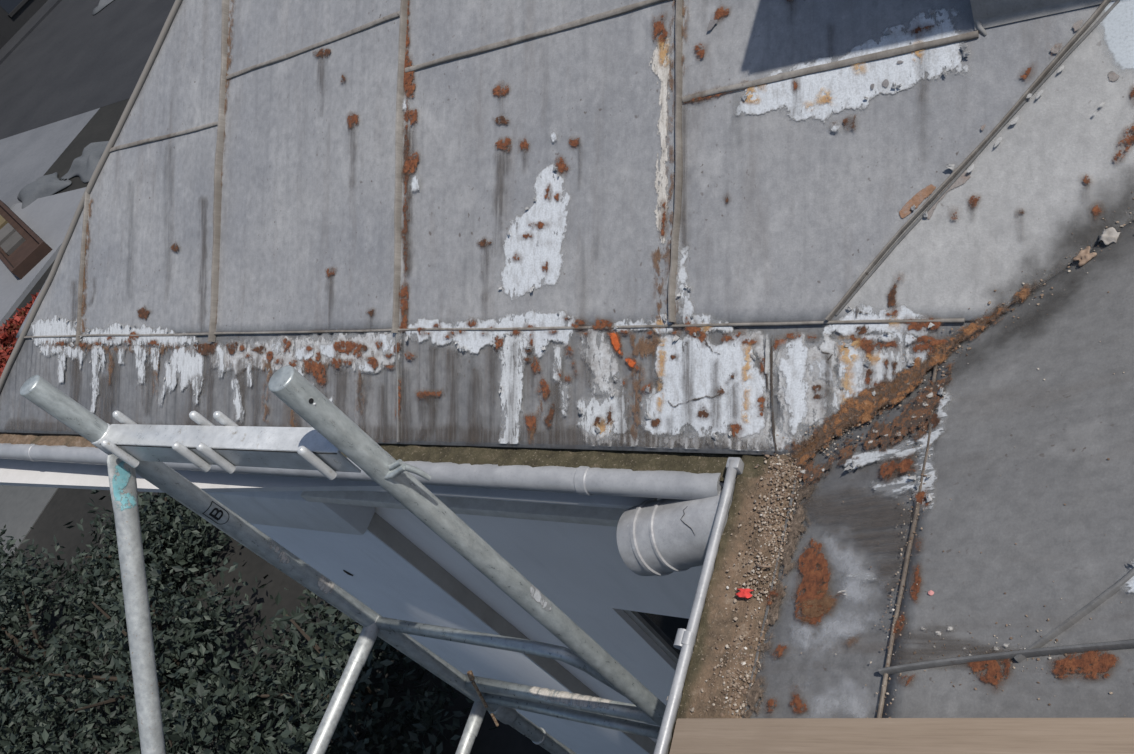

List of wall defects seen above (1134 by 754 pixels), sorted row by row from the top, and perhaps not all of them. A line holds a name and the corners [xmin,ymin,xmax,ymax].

peeling [735,6,971,123]
peeling [1100,0,1134,82]
rust [495,116,529,152]
rust [45,0,430,420]
peeling [498,163,571,300]
water stain [1055,187,1134,269]
peeling [30,245,941,451]
rust [572,150,677,438]
rust [887,277,901,307]
water stain [999,273,1079,341]
peeling [842,387,952,511]
rust [795,538,847,627]